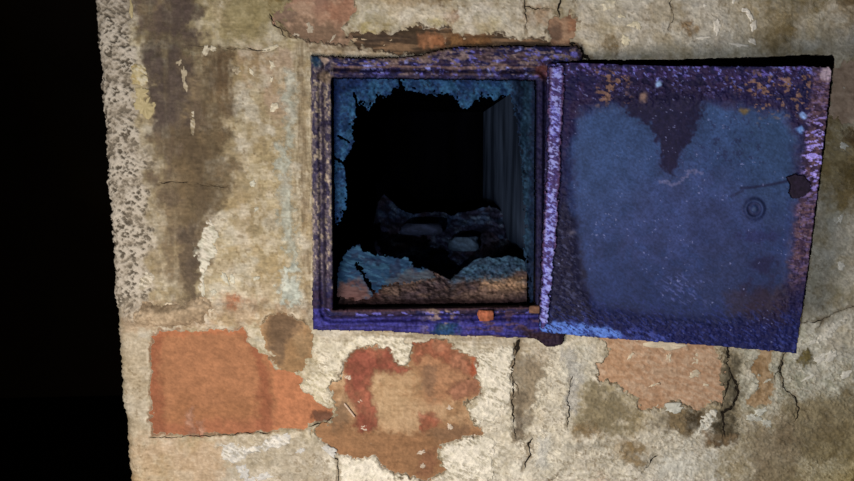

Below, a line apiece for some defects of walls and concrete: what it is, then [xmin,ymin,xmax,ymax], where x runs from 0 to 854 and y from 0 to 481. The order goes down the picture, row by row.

spalling [270,0,580,55]
crack [524,0,561,28]
leakage [132,0,242,302]
spalling [149,312,516,481]
crack [511,339,533,467]
spalling [596,338,726,435]
crack [720,347,740,436]
crack [774,352,800,422]